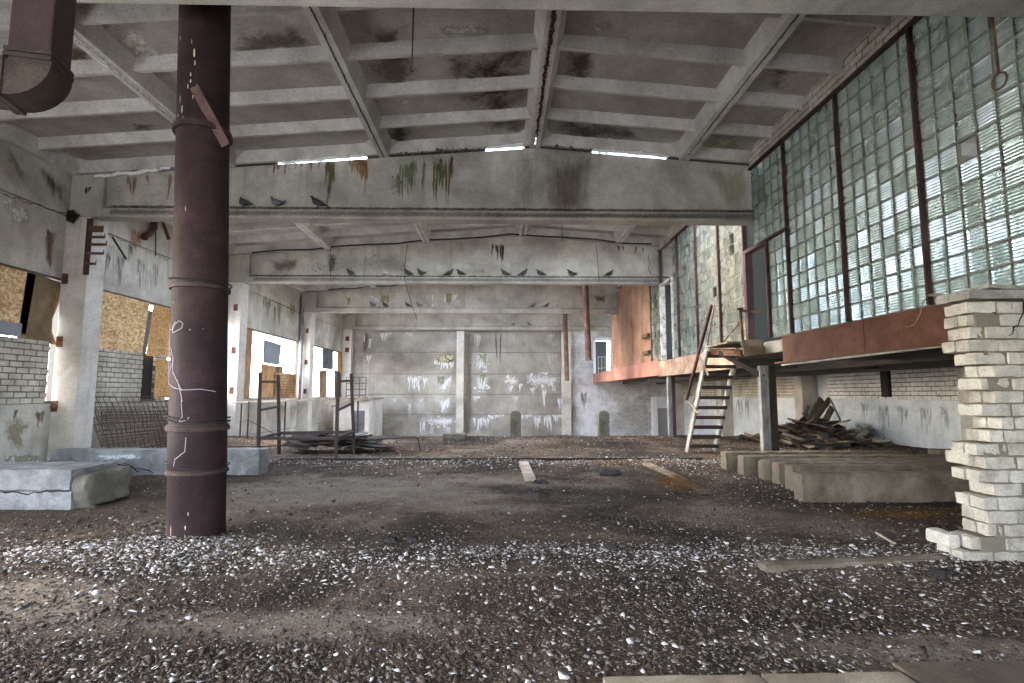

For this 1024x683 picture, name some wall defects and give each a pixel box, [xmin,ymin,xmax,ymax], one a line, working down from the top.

leakage [450,51,519,79]
crack [534,10,557,143]
leakage [569,54,591,78]
leakage [469,89,523,149]
leakage [229,153,753,219]
leakage [9,422,27,445]
leakage [408,360,454,436]
leakage [465,334,504,434]
leakage [508,381,562,429]
leakage [856,424,878,437]